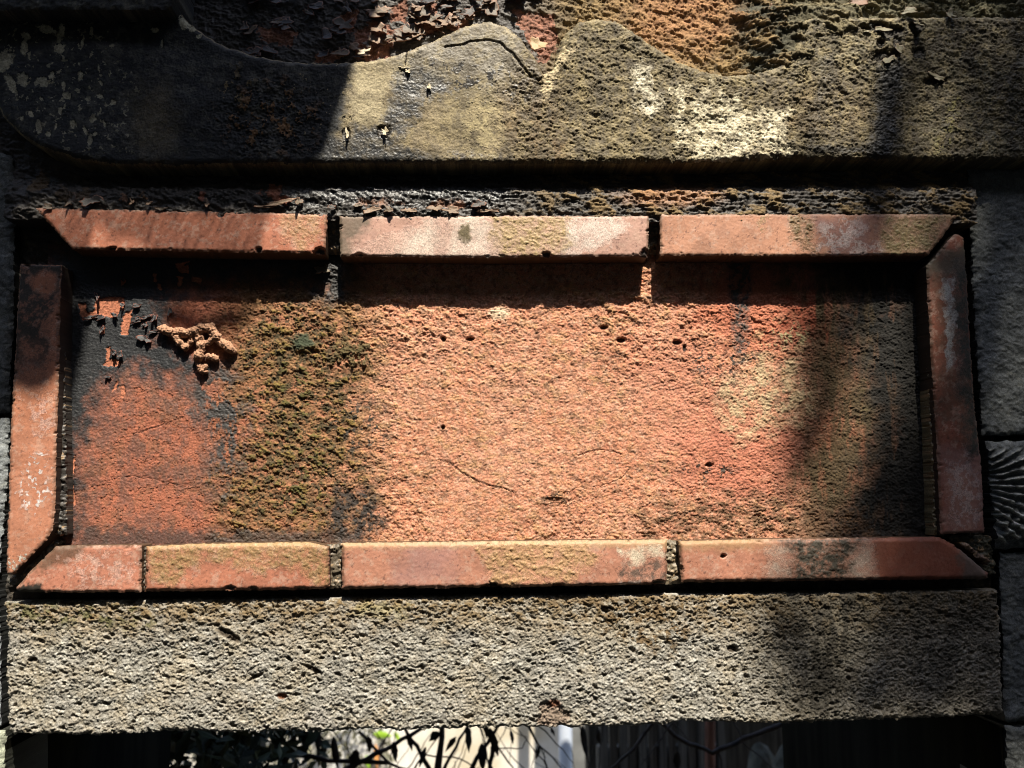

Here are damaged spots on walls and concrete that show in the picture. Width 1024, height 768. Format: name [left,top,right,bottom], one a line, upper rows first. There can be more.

peeling [178,15,202,39]
peeling [0,23,106,147]
peeling [208,0,560,161]
crack [445,39,543,82]
water stain [624,53,910,164]
peeling [78,278,173,343]
peeling [103,346,126,398]
water stain [177,361,259,501]
crack [438,459,516,493]